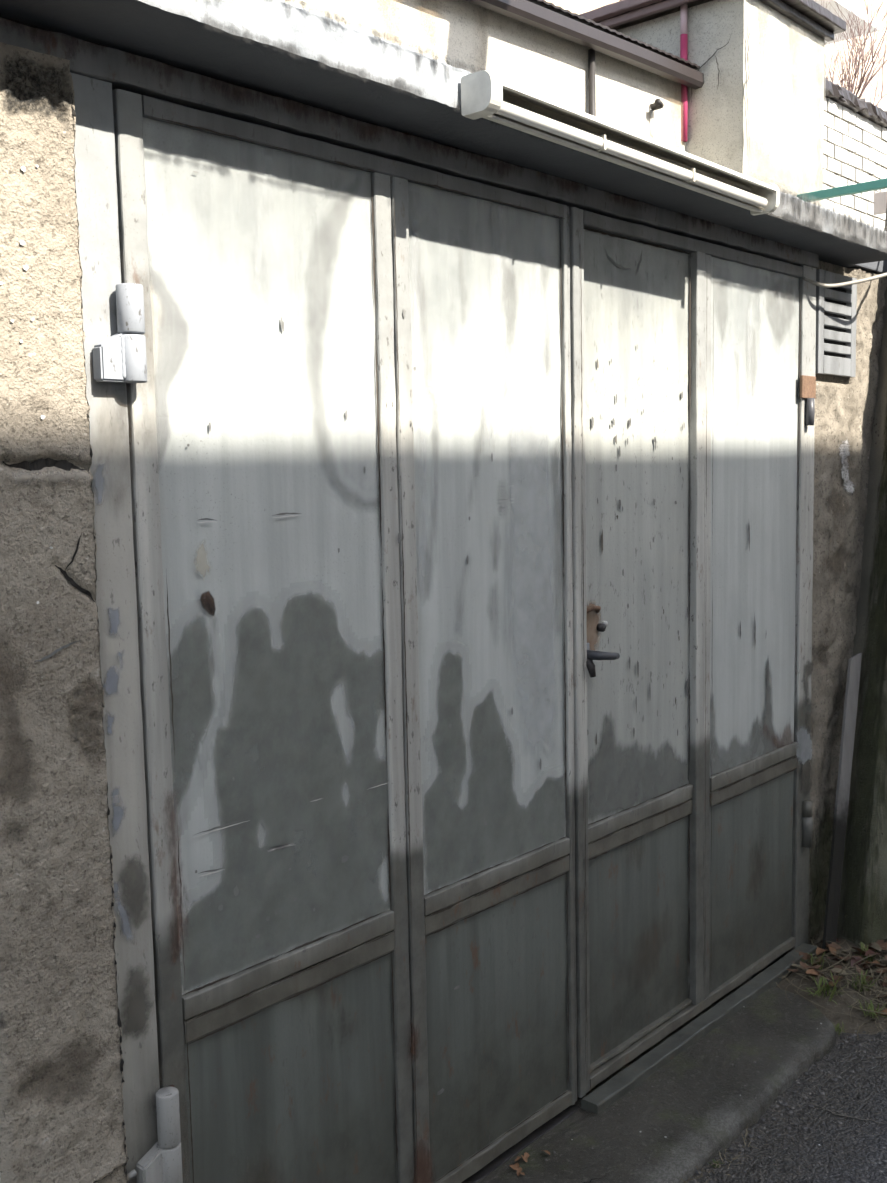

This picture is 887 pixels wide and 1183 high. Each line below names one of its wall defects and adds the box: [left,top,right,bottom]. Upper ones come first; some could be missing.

crack [690,10,754,149]
crack [3,93,105,748]
crack [94,782,129,1183]
leakage [169,593,390,992]
leakage [424,652,566,891]
leakage [588,716,689,818]
leakage [710,674,780,776]
leakage [842,454,887,945]